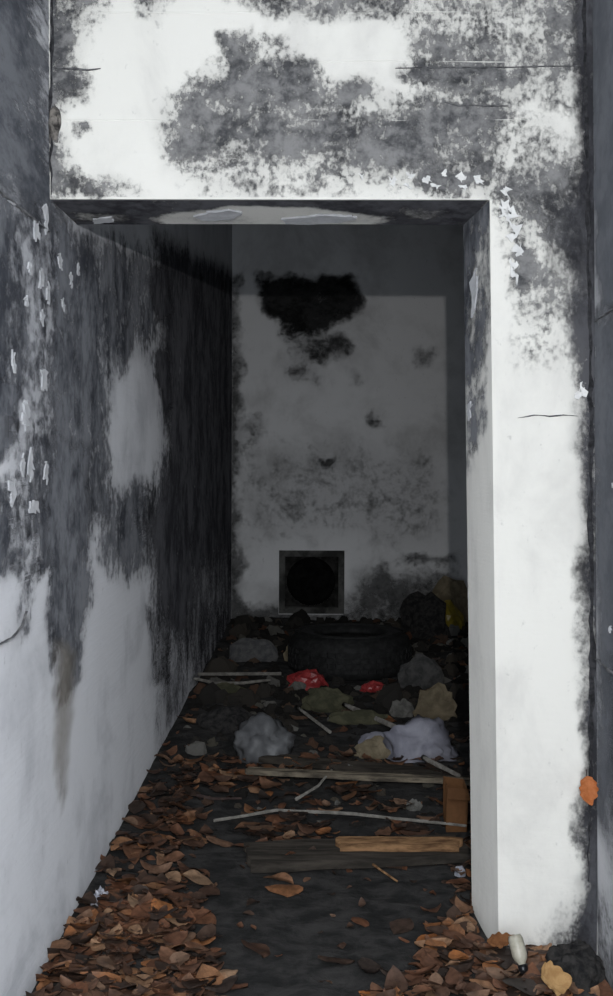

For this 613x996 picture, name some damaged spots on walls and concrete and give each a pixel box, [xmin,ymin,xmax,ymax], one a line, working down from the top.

peeling [389,169,484,191]
peeling [499,186,524,284]
peeling [39,369,48,391]
damp [0,0,491,748]
peeling [20,400,31,431]
crack [519,412,575,420]
peeling [7,447,49,507]
damp [161,0,613,955]
peeling [27,500,40,514]